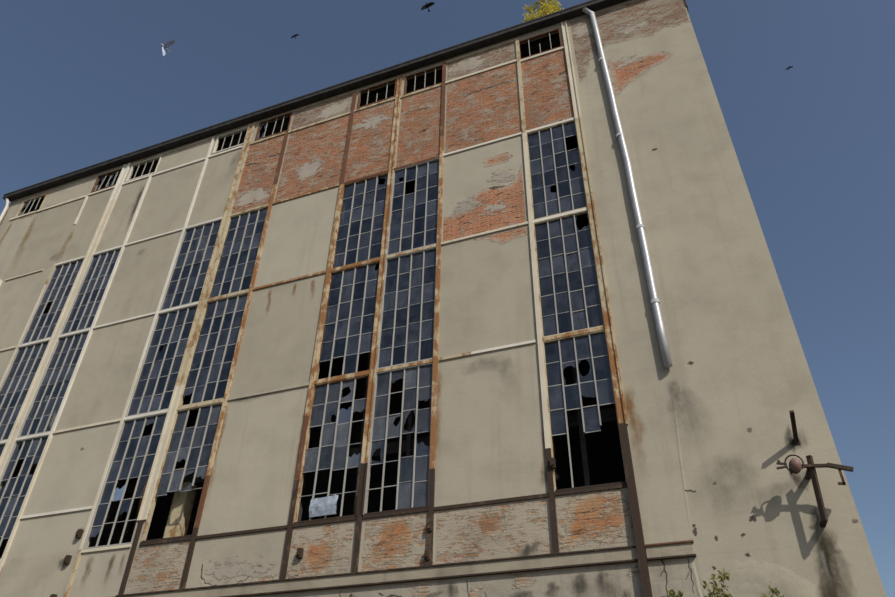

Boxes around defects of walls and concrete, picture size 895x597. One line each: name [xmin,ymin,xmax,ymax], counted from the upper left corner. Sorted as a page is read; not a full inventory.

spalling [231,0,690,214]
spalling [443,152,527,244]
spalling [199,522,354,587]
spalling [362,489,636,572]
crack [661,558,694,596]
damp [818,534,847,597]